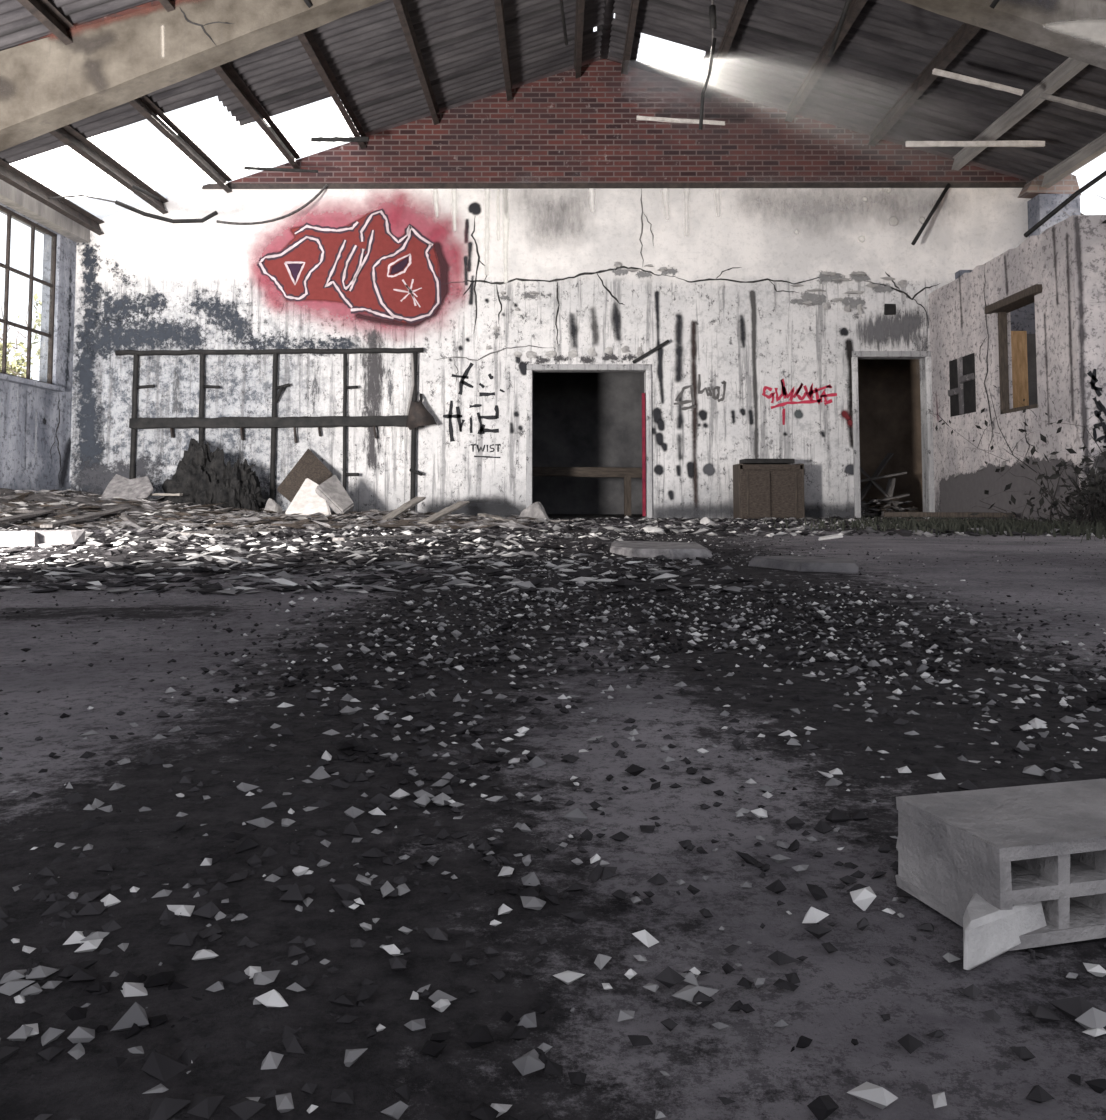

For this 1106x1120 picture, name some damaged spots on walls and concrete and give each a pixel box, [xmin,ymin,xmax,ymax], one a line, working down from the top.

crack [434,189,819,385]
leakage [60,239,393,495]
leakage [856,308,929,380]
leakage [426,499,524,517]
leakage [655,505,733,519]
leakage [805,505,862,519]